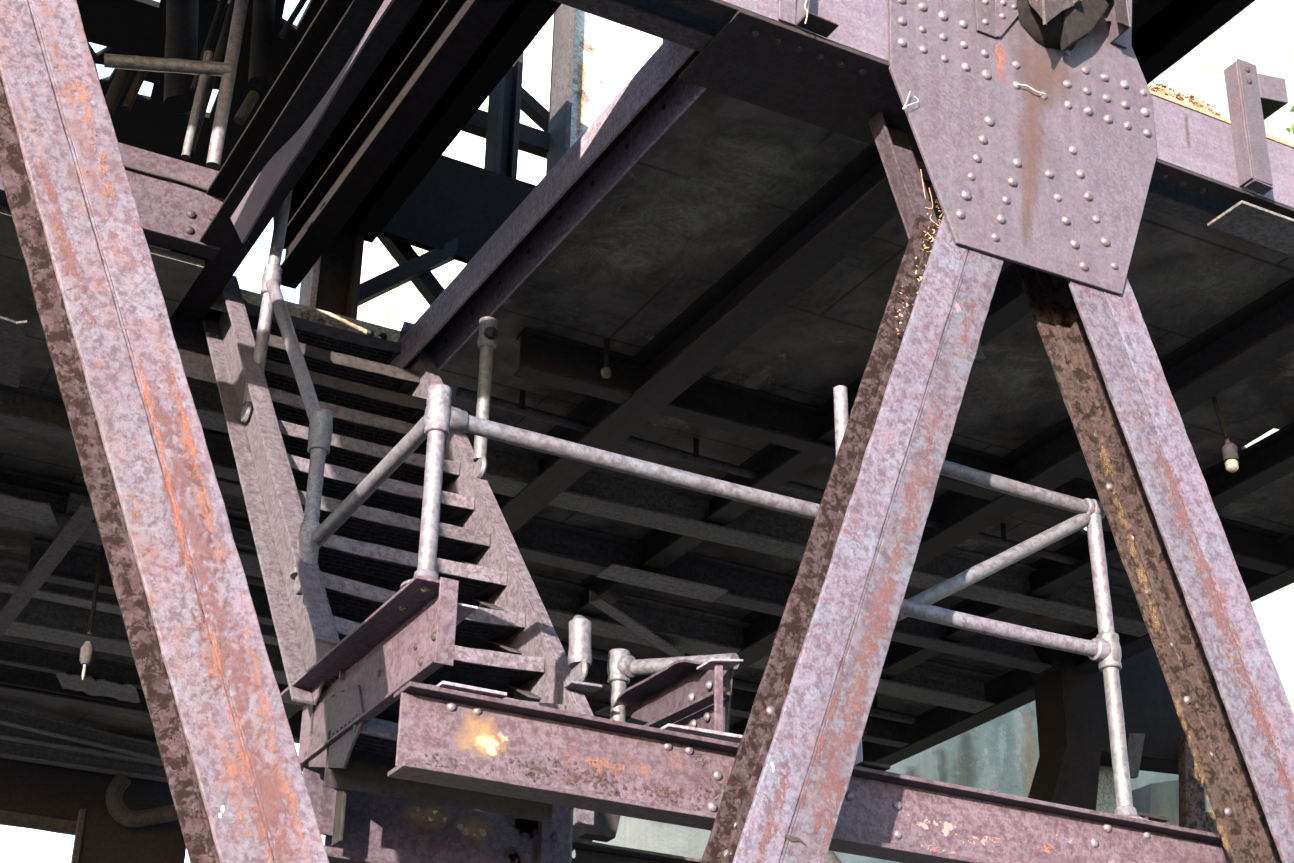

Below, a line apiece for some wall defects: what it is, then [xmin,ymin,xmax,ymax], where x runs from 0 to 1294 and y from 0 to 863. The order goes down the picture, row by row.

corrosion [76,82,115,195]
corrosion [573,38,605,135]
corrosion [34,157,96,324]
corrosion [138,369,302,863]
corrosion [758,412,945,863]
corrosion [1101,445,1160,630]
corrosion [1149,435,1294,813]
peeling [903,811,1002,854]
corrosion [1176,702,1229,851]